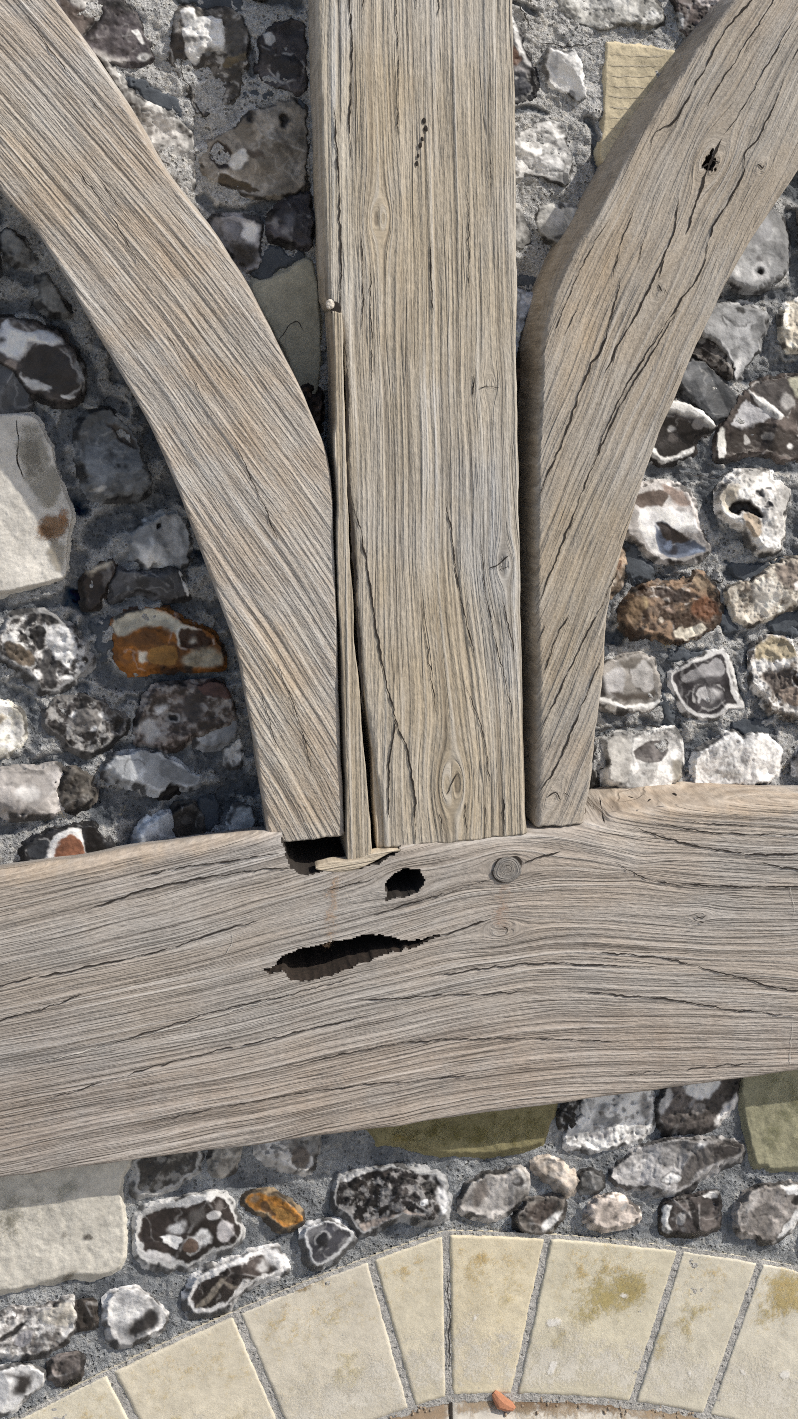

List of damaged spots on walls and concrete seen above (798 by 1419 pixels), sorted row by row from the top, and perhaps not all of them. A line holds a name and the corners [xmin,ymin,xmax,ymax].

crack [334,0,798,838]
crack [319,877,493,915]
crack [425,920,488,941]
crack [24,951,798,1127]